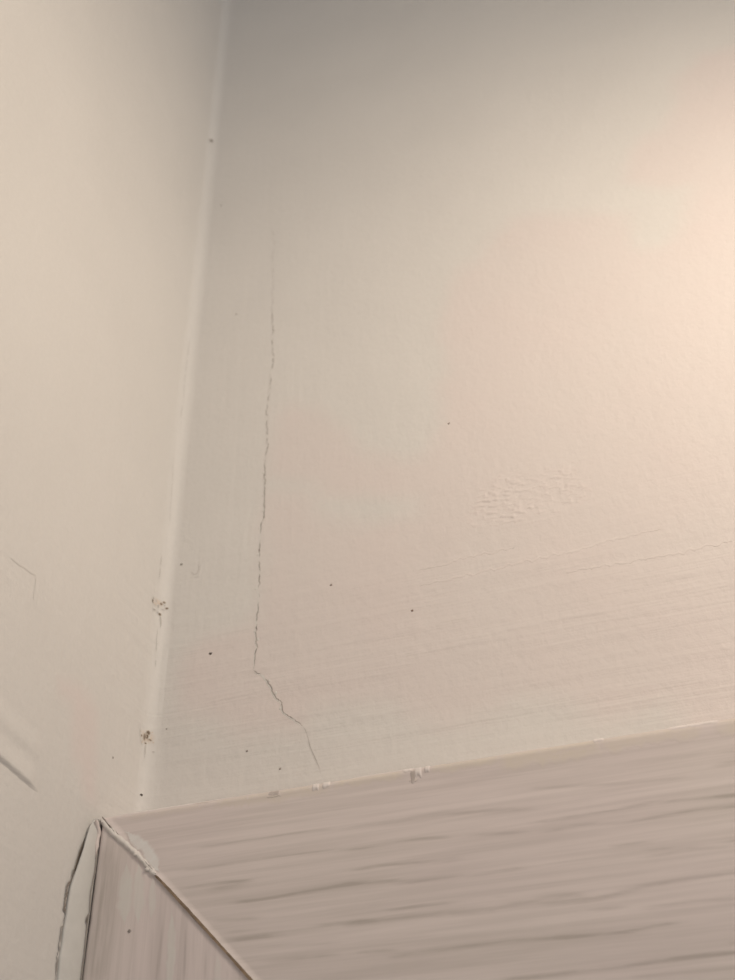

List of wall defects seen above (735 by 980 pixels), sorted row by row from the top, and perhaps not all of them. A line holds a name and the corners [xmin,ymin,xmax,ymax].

crack [253,225,320,769]